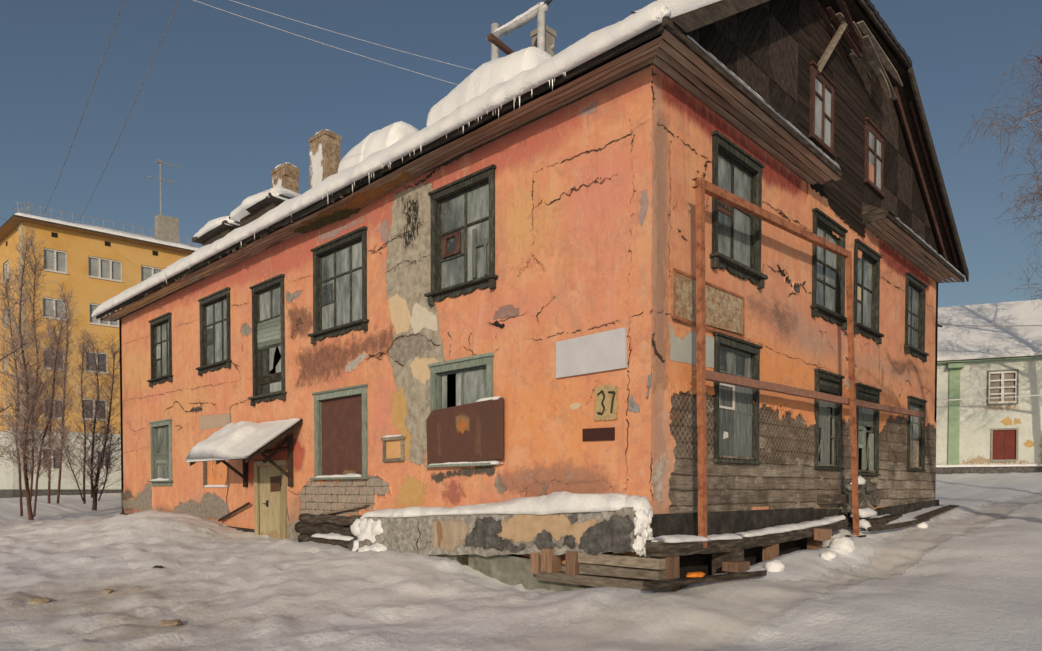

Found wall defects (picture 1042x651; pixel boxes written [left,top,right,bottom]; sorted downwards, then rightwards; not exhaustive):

water stain [662,79,800,193]
crack [122,343,250,452]
water stain [289,308,312,336]
water stain [296,169,445,466]
flaking render [388,293,438,385]
crack [366,68,711,497]
peeling [670,324,714,368]
crack [762,265,811,297]
crack [742,305,937,402]
water stain [432,466,495,504]
flaking render [651,380,936,514]
spalling [408,513,634,555]